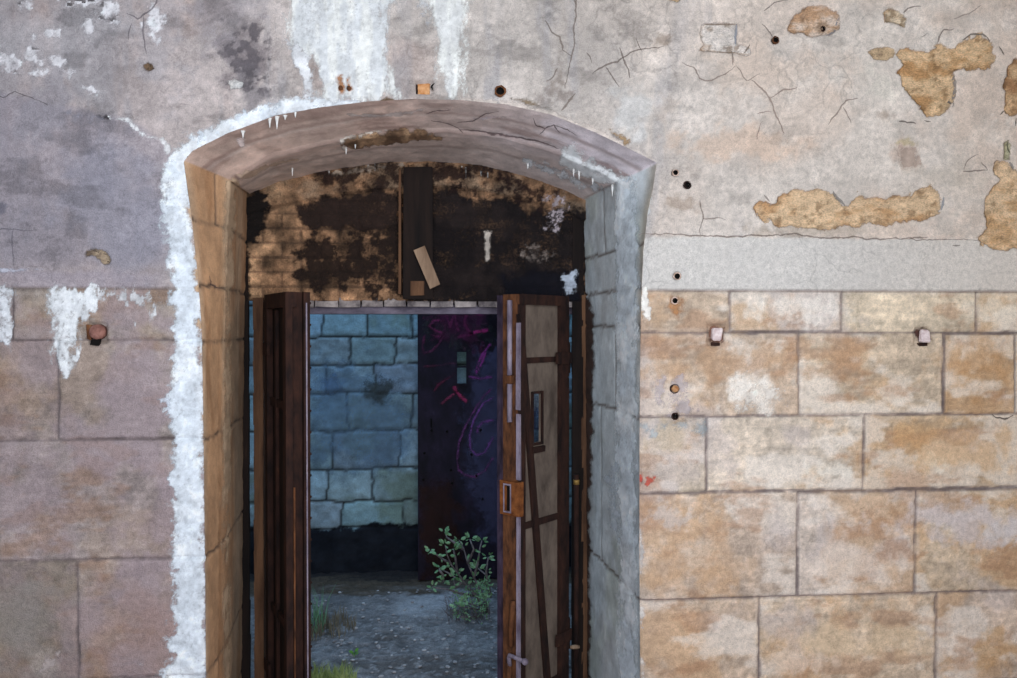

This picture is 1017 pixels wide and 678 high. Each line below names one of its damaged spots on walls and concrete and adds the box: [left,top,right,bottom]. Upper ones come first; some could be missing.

damp [0,28,73,79]
crack [427,0,663,149]
crack [682,53,797,136]
flaking render [787,6,840,37]
flaking render [868,33,1017,126]
spalling [340,128,442,150]
flaking render [754,185,944,231]
flaking render [978,141,1017,251]
damp [0,285,14,345]
damp [46,0,401,678]